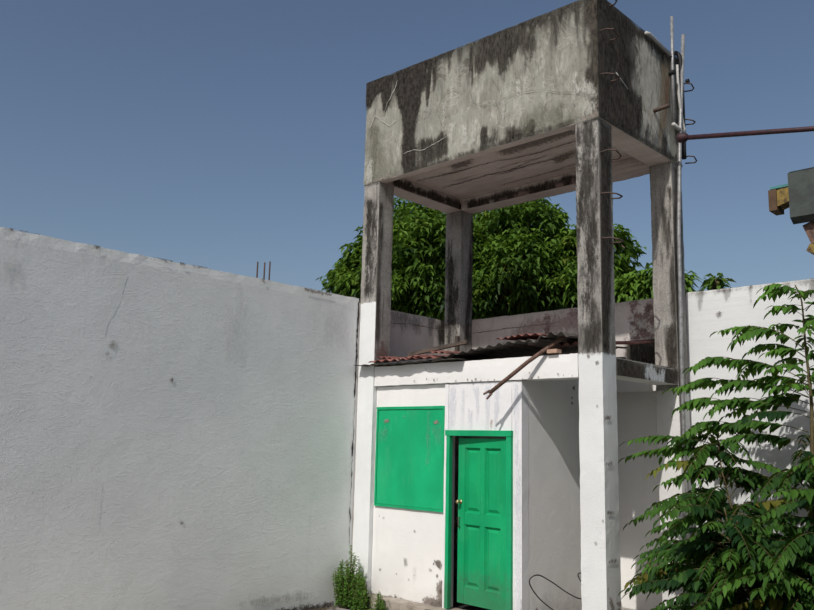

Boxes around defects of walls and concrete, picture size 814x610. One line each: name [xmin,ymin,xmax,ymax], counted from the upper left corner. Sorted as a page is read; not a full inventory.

crack [417,141,576,188]
damp [364,0,683,418]
peeling [422,560,442,607]